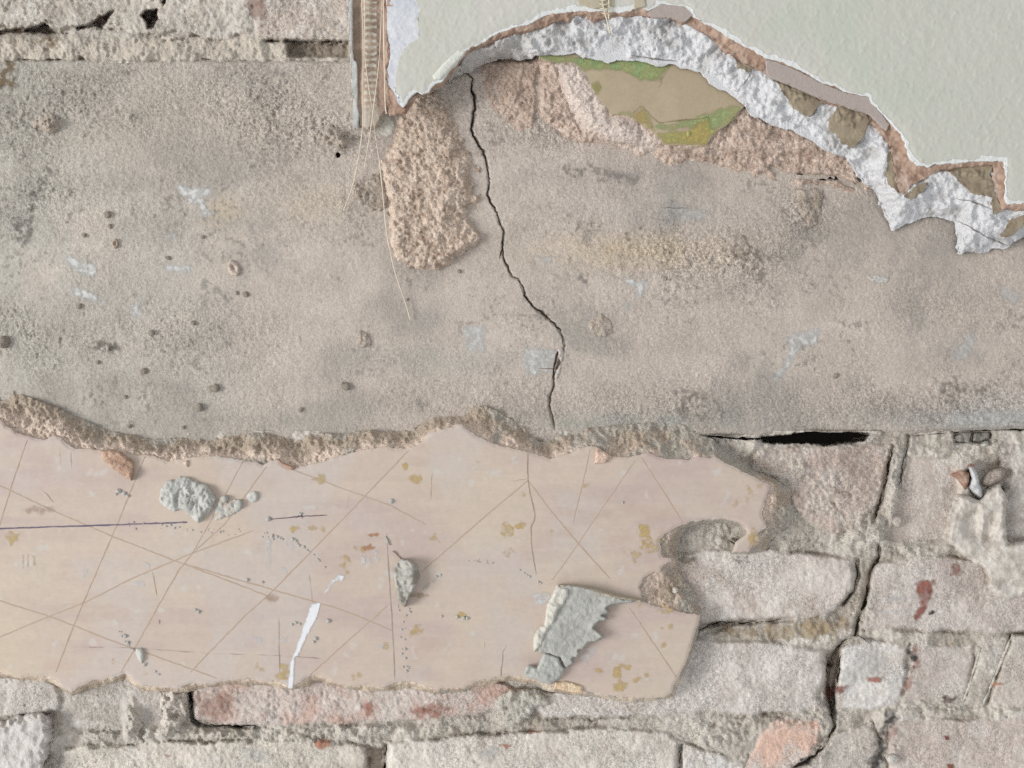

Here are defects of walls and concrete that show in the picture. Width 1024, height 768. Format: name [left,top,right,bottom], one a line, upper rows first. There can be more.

peeling [541,55,672,84]
peeling [632,106,740,145]
crack [467,73,565,427]
peeling [953,432,990,443]
spalling [0,391,798,703]